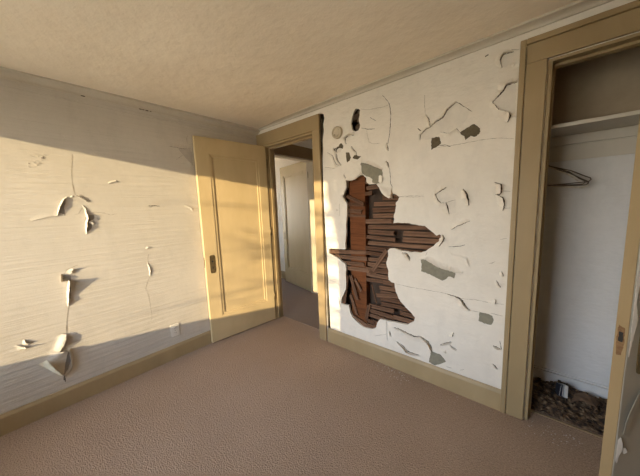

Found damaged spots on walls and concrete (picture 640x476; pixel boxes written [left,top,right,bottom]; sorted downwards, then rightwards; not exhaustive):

crack [370,96,424,197]
peeling [489,77,517,122]
peeling [30,186,114,234]
spalling [327,109,463,368]
peeling [38,265,77,382]